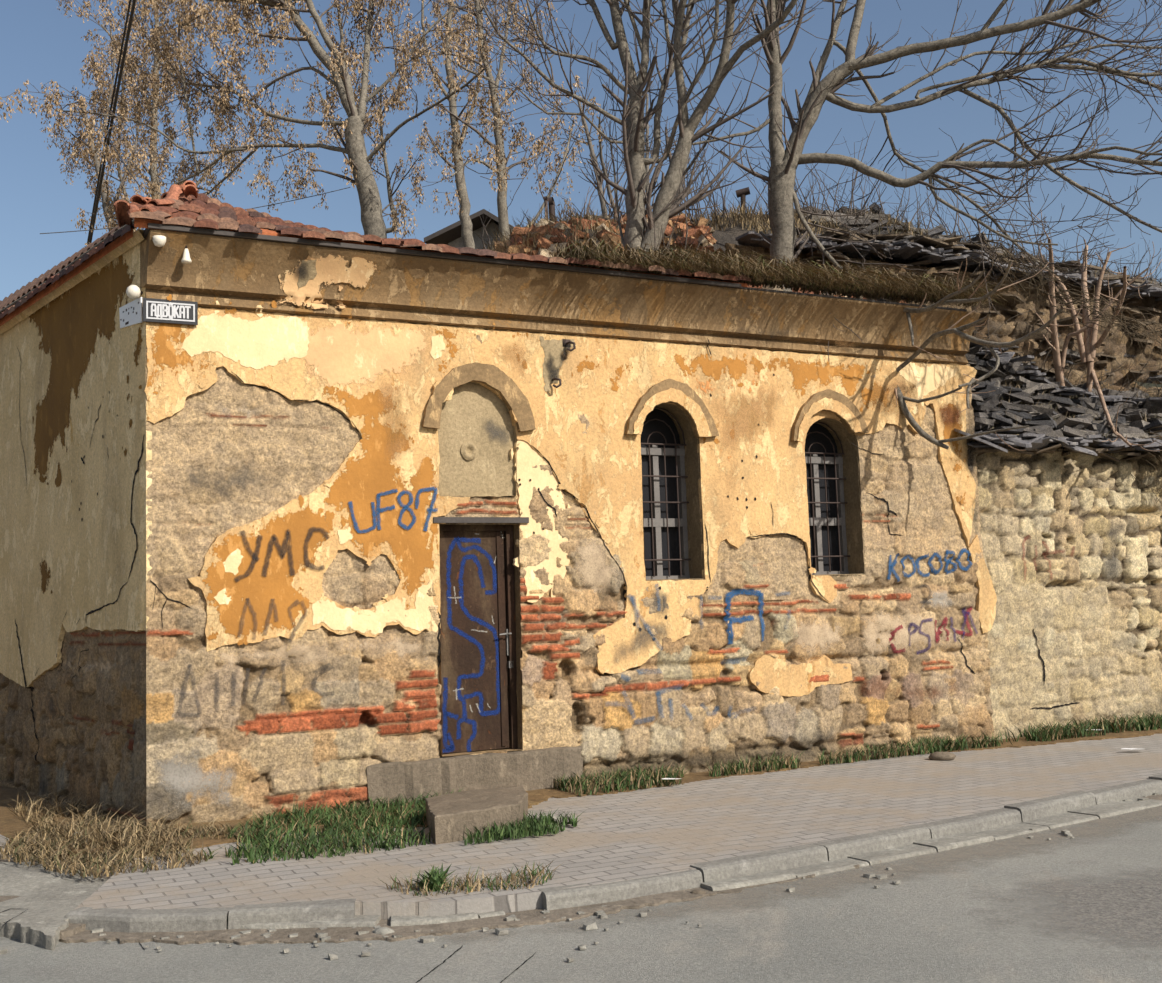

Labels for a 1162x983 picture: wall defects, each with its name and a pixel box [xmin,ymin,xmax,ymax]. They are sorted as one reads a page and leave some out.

peeling [22,255,134,488]
crack [15,436,192,762]
spalling [117,253,476,648]
spalling [509,440,642,631]
spalling [706,529,816,601]
spalling [674,353,968,586]